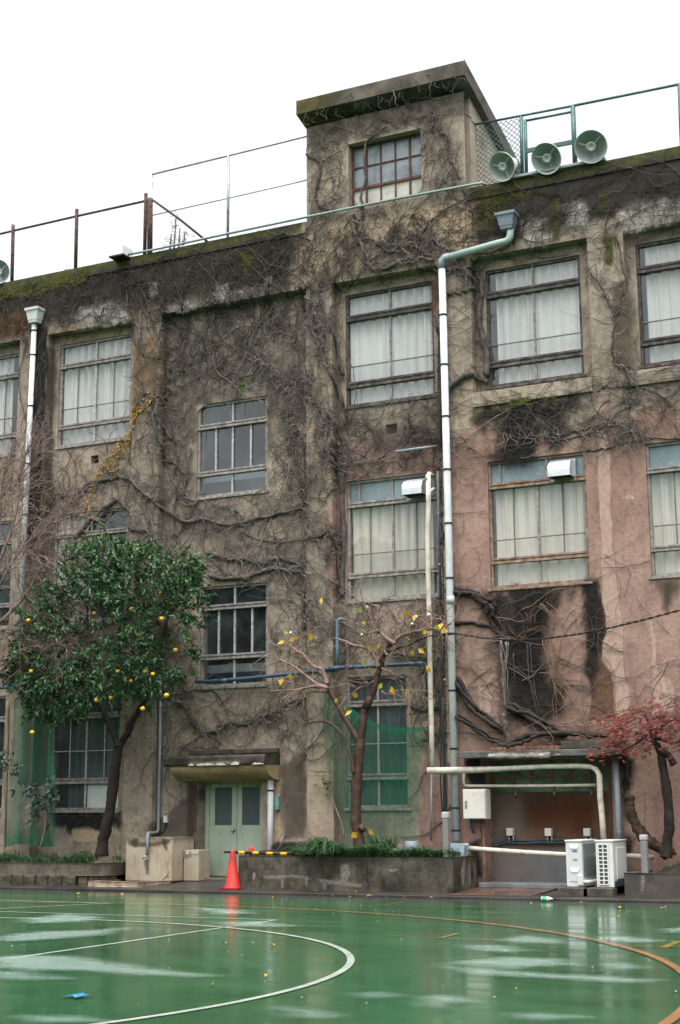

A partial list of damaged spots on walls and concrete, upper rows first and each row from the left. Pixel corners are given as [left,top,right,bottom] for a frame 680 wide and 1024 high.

leakage [473,396,578,463]
leakage [571,392,630,722]
leakage [462,586,563,721]